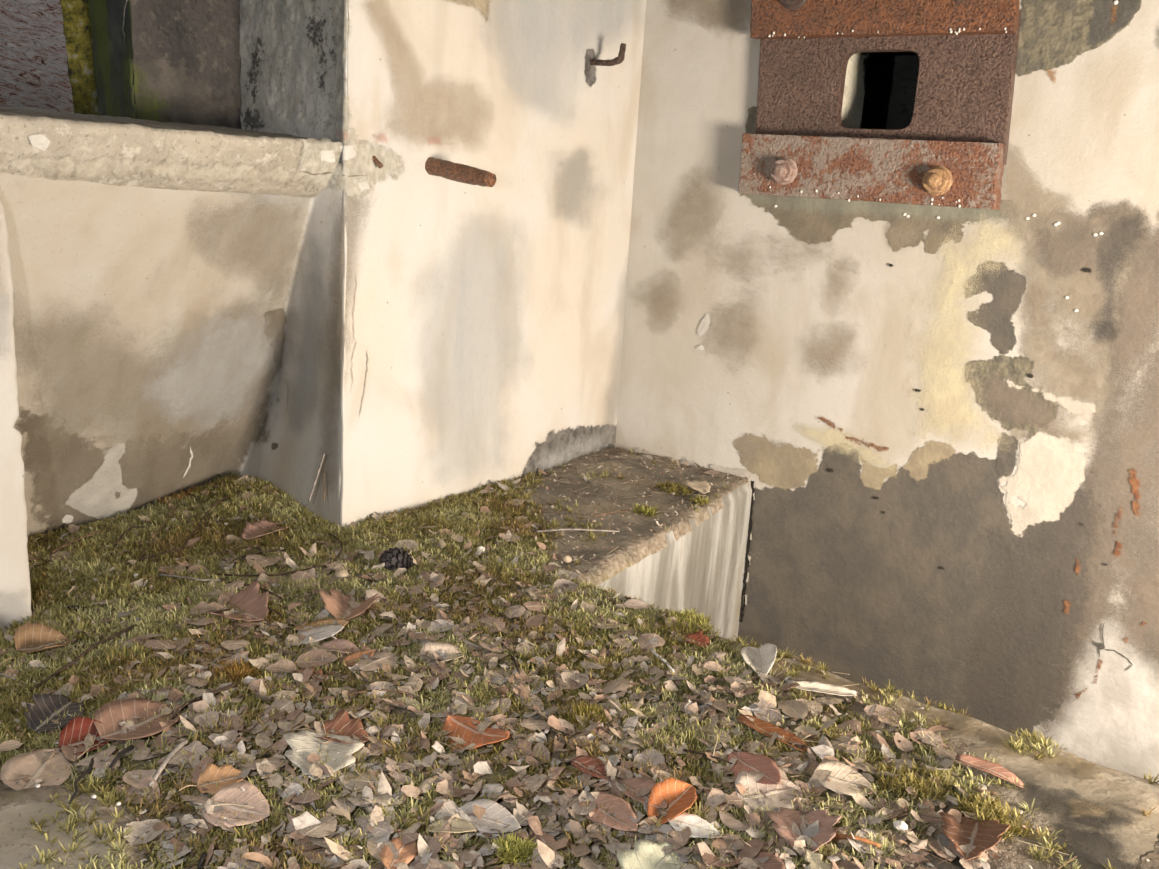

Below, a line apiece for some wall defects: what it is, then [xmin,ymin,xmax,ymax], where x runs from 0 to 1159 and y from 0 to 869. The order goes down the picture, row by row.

spalling [295,0,405,200]
spalling [448,0,492,22]
spalling [1016,0,1142,76]
damp [521,142,1159,740]